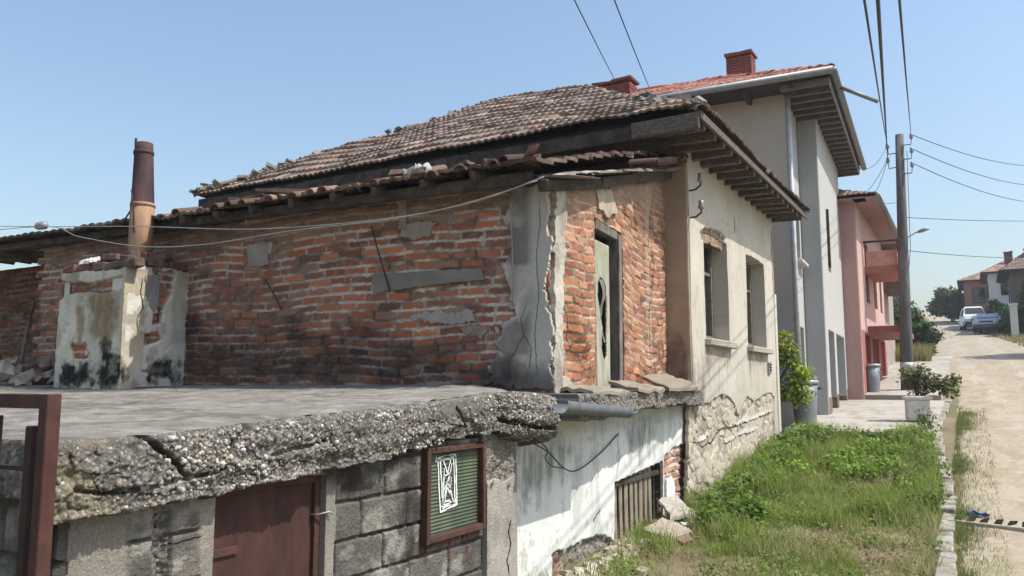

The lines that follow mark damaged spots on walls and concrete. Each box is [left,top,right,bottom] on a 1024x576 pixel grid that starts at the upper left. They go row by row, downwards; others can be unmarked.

leakage [59,362,95,388]
flaking render [68,341,88,365]
flaking render [140,325,160,351]
crack [508,205,540,380]
flaking render [481,178,568,393]
flaking render [645,393,774,541]